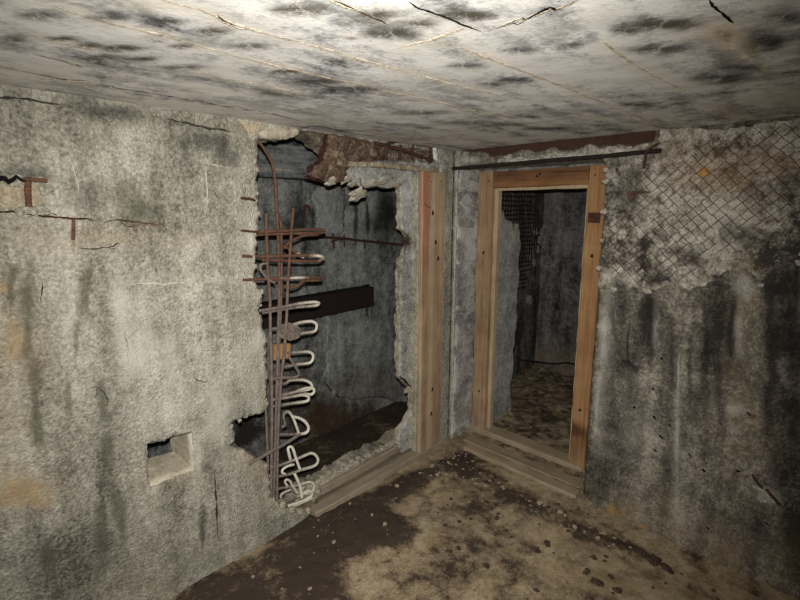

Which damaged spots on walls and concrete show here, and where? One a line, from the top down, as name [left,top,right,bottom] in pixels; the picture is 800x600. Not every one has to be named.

leakage [273,4,324,14]
leakage [369,21,431,38]
leakage [444,11,493,19]
crack [410,0,577,32]
leakage [614,18,695,33]
crack [709,0,734,23]
crack [0,54,348,132]
spalling [375,141,449,170]
spalling [0,174,55,220]
spalling [596,118,800,294]
crack [0,210,157,250]
peeling [238,119,404,514]